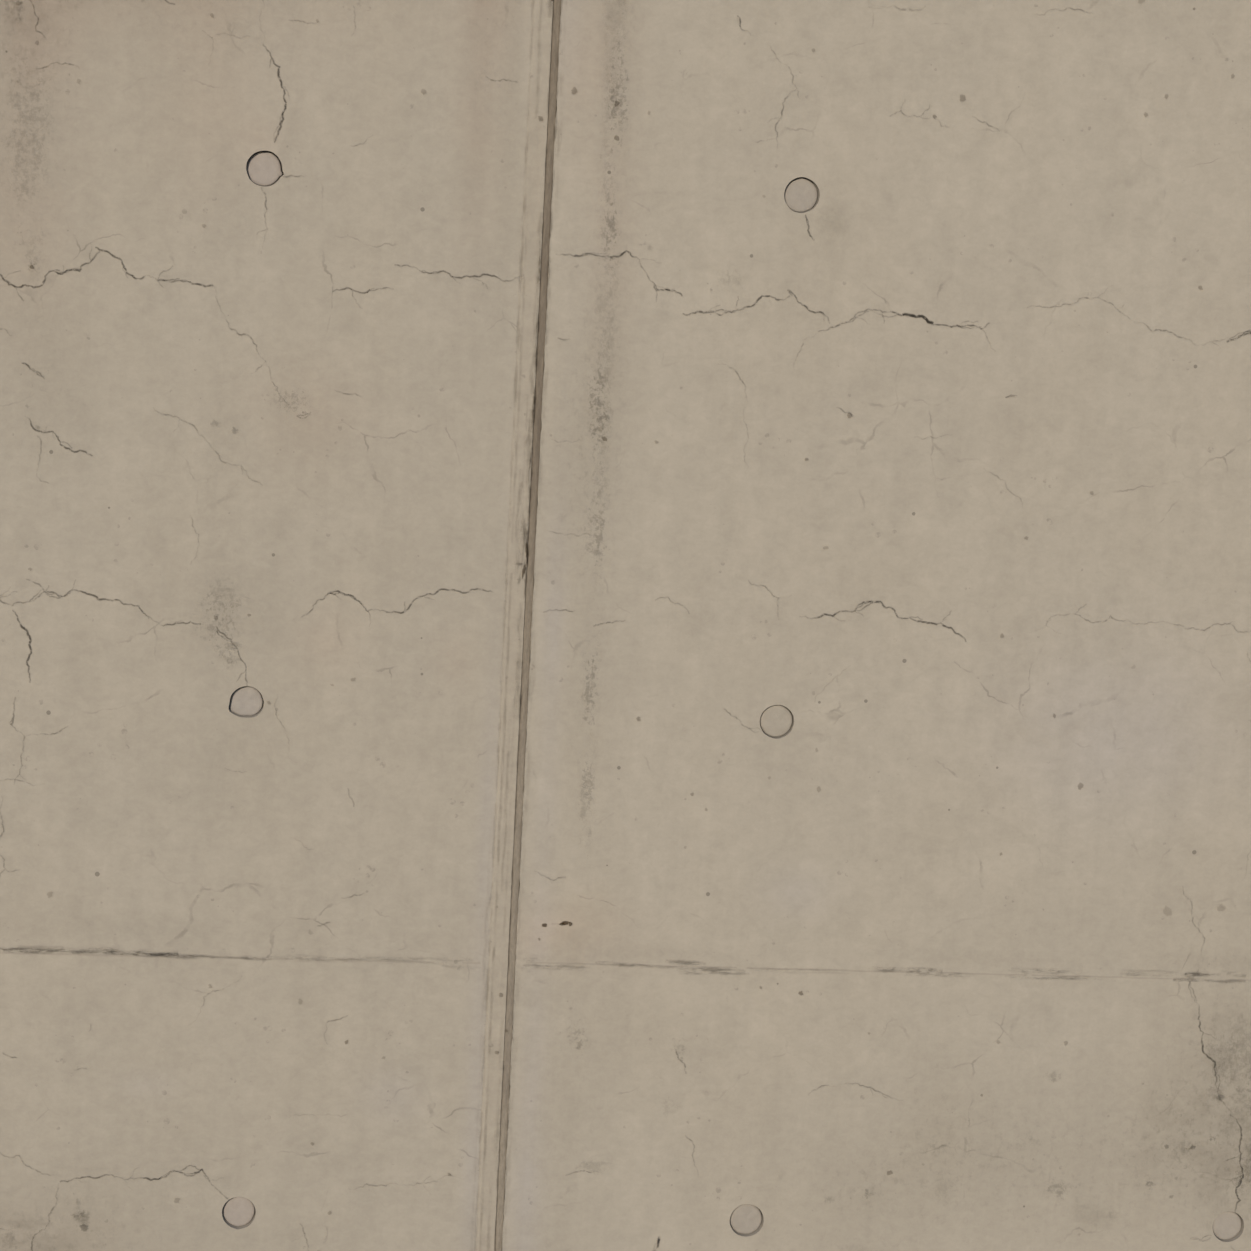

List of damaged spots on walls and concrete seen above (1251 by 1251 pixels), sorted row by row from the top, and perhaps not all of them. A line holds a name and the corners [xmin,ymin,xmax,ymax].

crack [903,313,952,327]